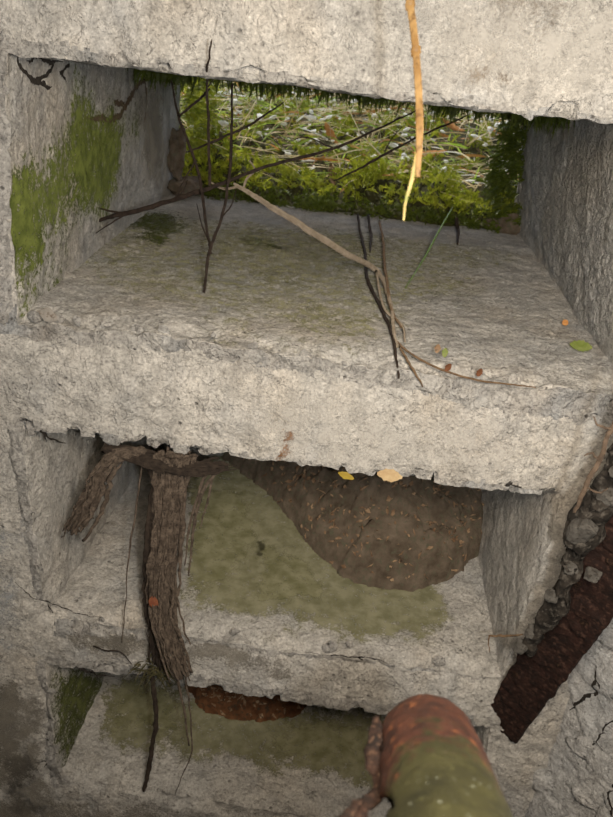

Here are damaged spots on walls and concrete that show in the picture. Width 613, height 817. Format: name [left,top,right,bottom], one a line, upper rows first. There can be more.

water stain [10,153,46,273]
crack [570,667,600,710]
crack [587,720,613,752]
crack [605,784,613,817]